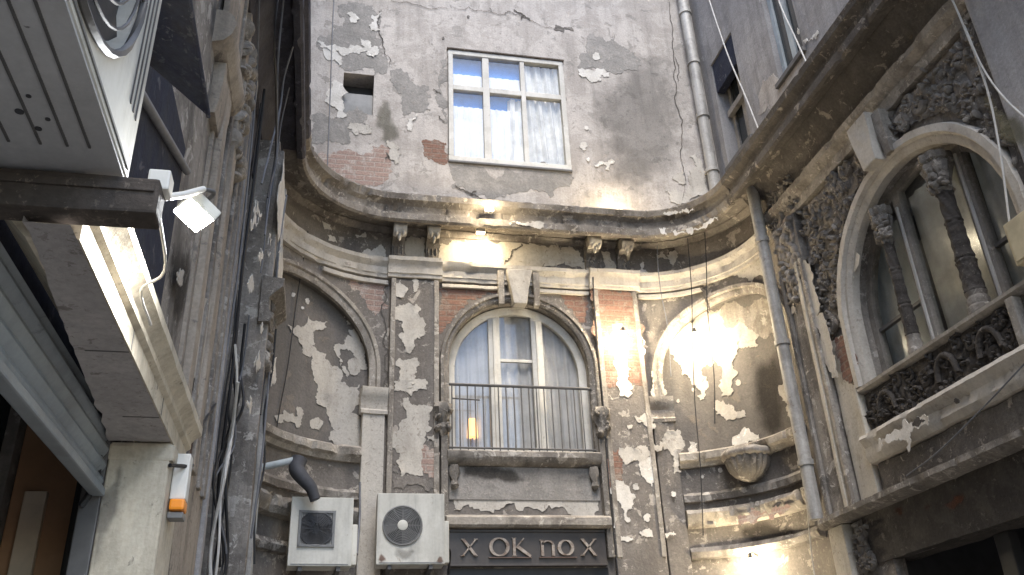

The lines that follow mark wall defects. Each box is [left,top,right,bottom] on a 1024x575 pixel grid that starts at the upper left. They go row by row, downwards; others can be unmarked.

peeling [310,1,448,187]
peeling [578,33,641,83]
crack [668,0,686,200]
peeling [422,139,574,199]
peeling [658,154,718,265]
peeling [274,293,367,446]
peeling [348,278,440,491]
peeling [453,500,599,515]
flaking render [561,289,680,403]
peeling [608,413,697,542]
peeling [668,297,775,446]
peeling [878,414,929,452]